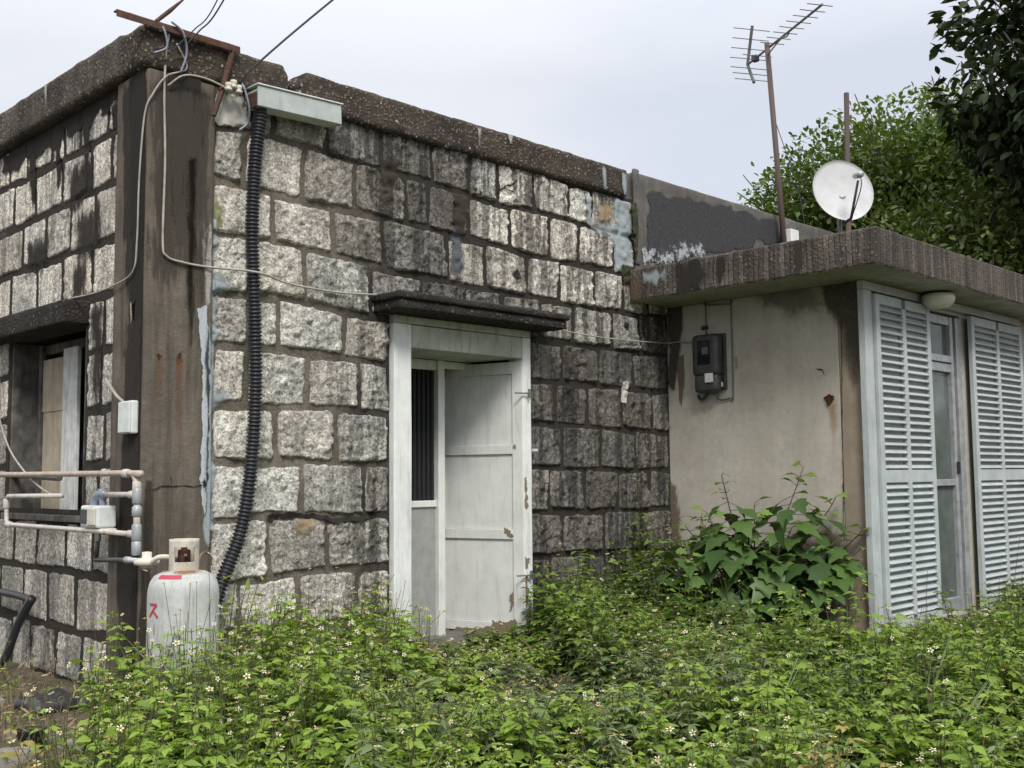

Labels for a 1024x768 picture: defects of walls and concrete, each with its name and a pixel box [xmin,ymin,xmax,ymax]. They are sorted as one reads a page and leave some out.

rust [114,0,240,54]
peeling [585,194,706,285]
damp [2,68,212,680]